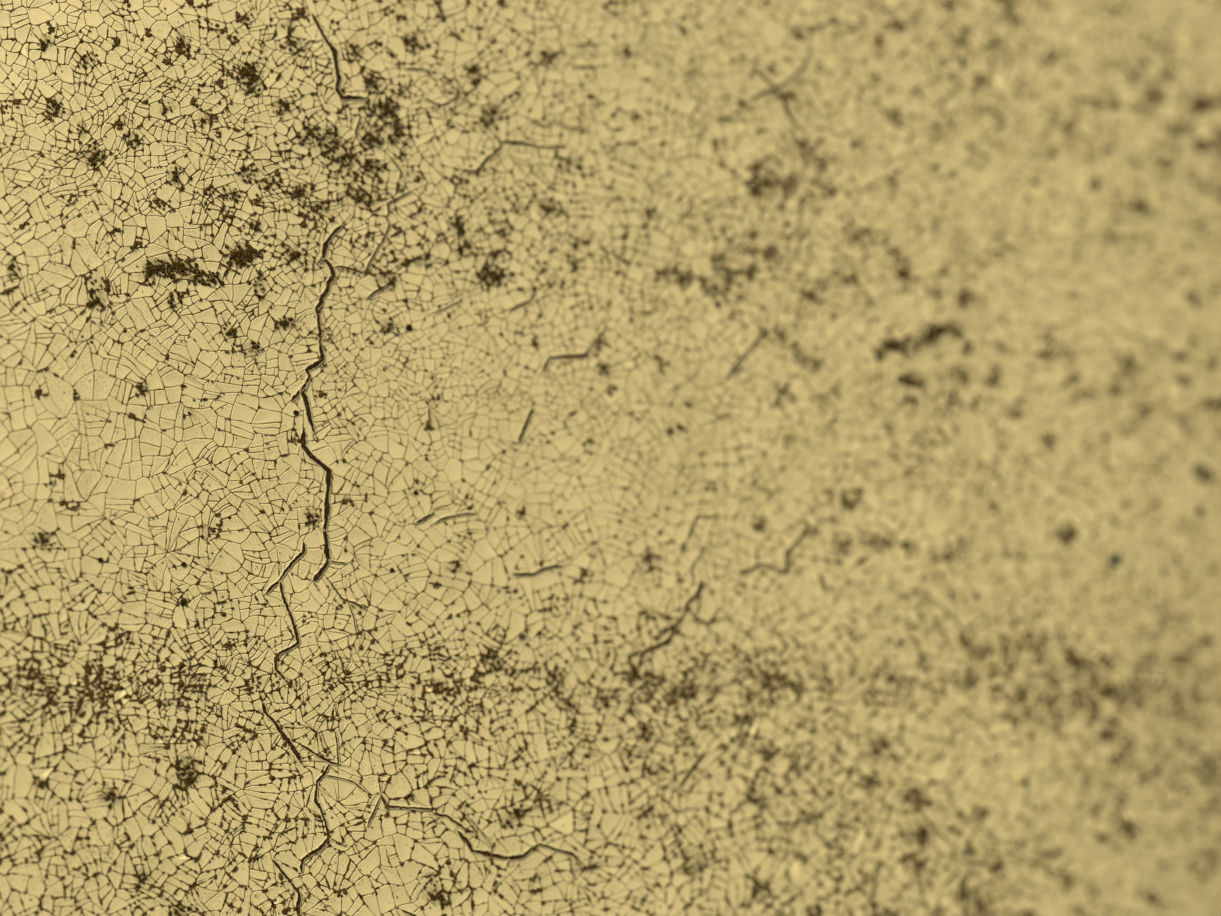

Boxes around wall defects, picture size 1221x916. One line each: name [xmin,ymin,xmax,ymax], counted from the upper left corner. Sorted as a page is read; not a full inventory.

crack [300,0,365,138]
crack [541,326,612,372]
crack [261,156,600,916]
crack [635,513,718,668]
crack [738,517,833,594]